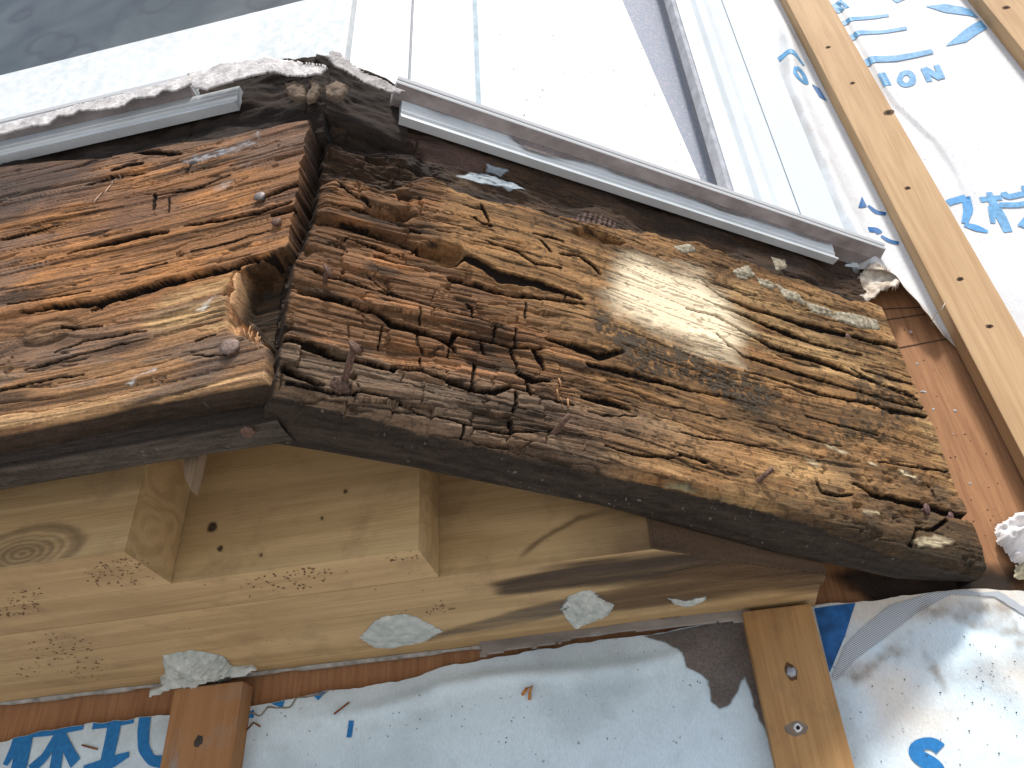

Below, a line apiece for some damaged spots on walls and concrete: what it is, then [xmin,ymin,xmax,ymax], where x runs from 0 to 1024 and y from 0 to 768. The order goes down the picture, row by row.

crack [0,150,299,392]
crack [281,185,763,464]
crack [695,300,926,447]
water stain [494,518,1021,611]
crack [816,461,965,547]